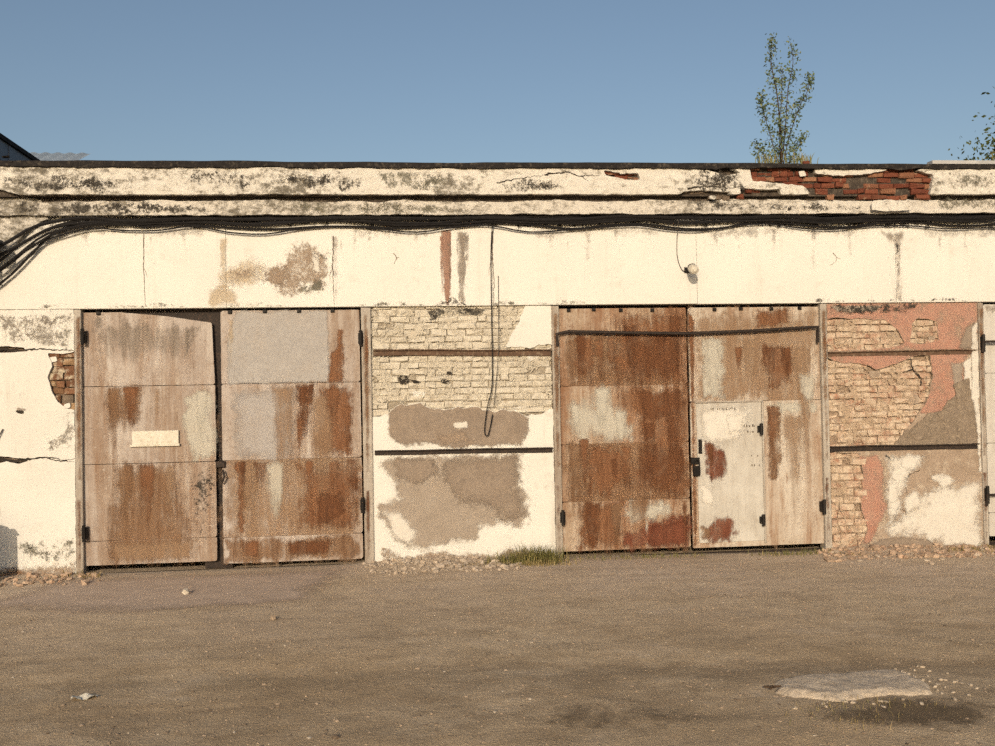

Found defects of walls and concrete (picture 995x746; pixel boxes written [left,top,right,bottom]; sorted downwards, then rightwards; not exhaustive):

leakage [4,175,216,237]
leakage [278,174,360,191]
spalling [683,161,931,212]
leakage [210,242,328,305]
corrosion [440,230,451,305]
crack [0,345,74,353]
spalling [0,314,75,410]
corrosion [225,319,369,564]
spalling [370,297,553,549]
corrosion [554,308,827,551]
spalling [827,303,978,548]
corrosion [109,465,193,562]